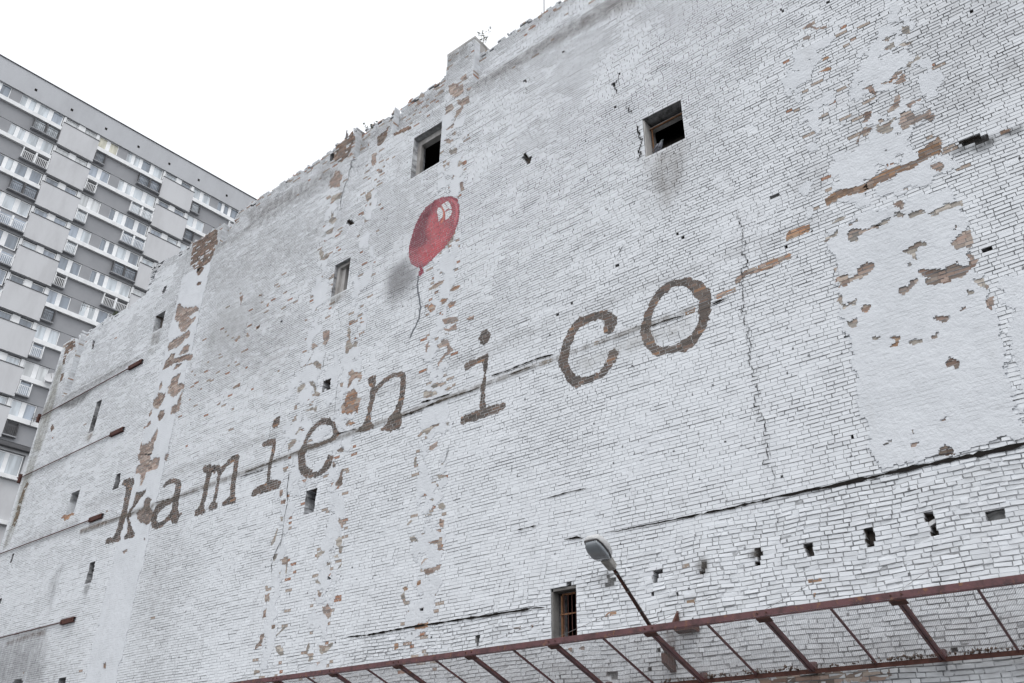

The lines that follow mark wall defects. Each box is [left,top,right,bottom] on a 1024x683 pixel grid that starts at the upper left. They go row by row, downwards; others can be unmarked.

flaking render [326,131,355,234]
crack [613,75,643,162]
flaking render [825,136,944,206]
flaking render [824,200,963,242]
flaking render [856,55,935,144]
spalling [959,129,1011,146]
flaking render [834,262,874,328]
flaking render [899,225,995,310]
crack [734,209,776,488]
flaking render [136,304,199,486]
flaking render [288,369,362,449]
crack [348,612,511,637]